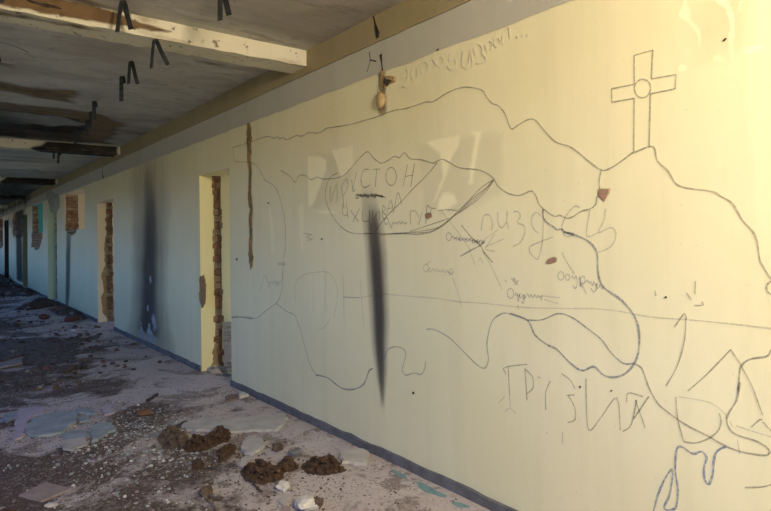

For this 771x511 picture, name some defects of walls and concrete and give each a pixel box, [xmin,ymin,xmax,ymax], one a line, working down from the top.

peeling [0,110,85,126]
spalling [31,206,42,250]
flaking render [47,192,79,298]
flaking render [101,203,114,322]
water stain [141,212,154,334]
flaking render [199,176,224,366]
water stain [371,223,383,381]